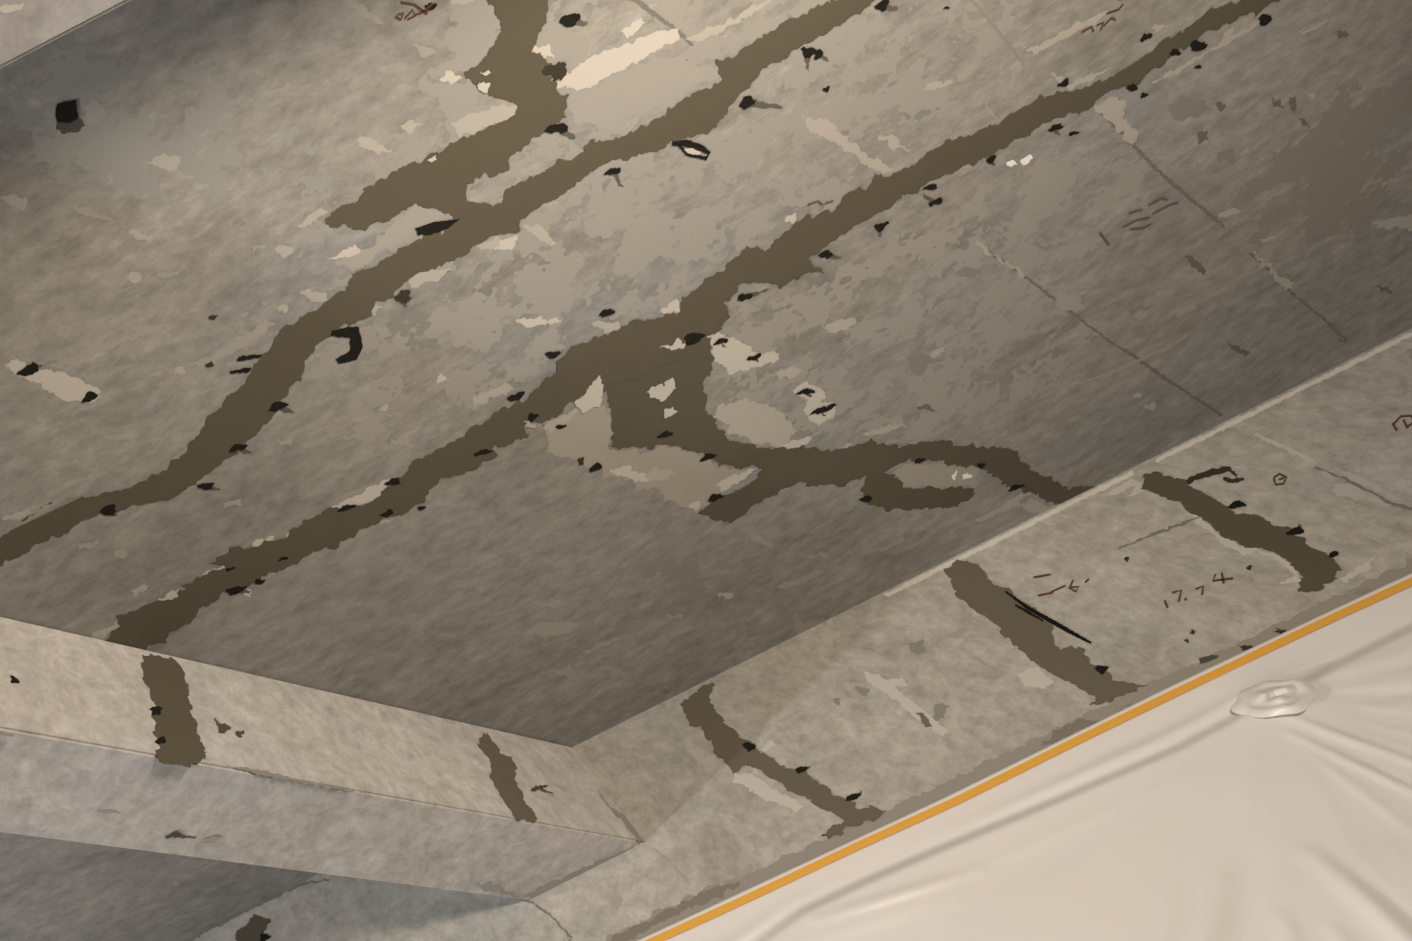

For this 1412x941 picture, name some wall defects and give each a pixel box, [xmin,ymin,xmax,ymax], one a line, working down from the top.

crack [1005,591,1092,644]
crack [185,878,330,941]